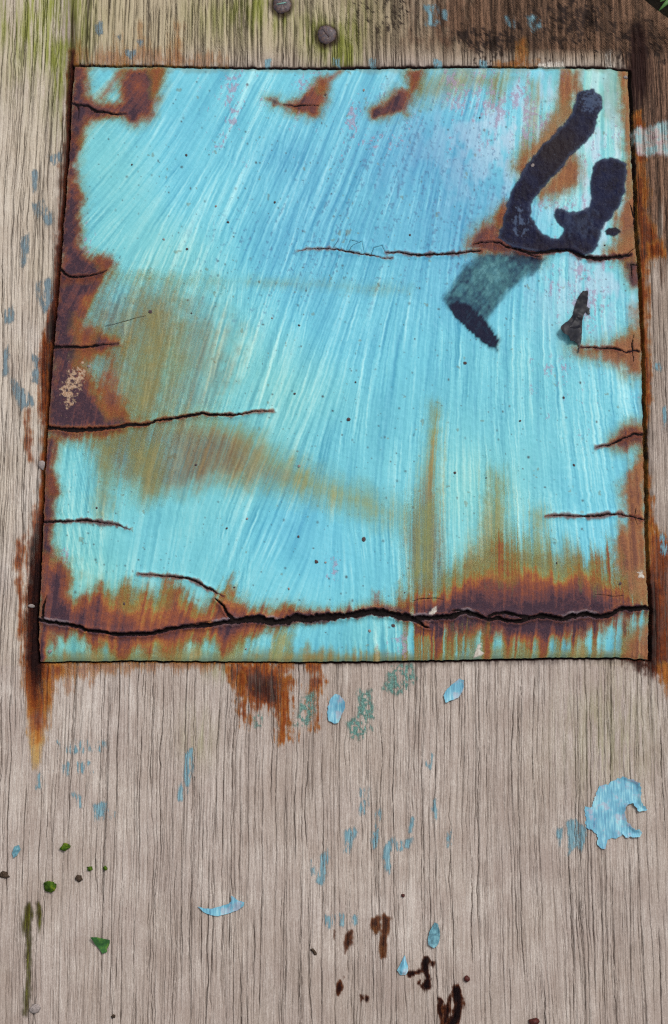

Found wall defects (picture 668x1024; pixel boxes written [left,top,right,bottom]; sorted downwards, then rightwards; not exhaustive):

crack [71,102,127,117]
crack [299,240,638,276]
crack [580,335,640,362]
corrosion [14,50,668,765]
crack [48,409,274,433]
crack [595,432,643,449]
crack [44,518,130,530]
crack [545,509,644,523]
crack [39,572,649,638]